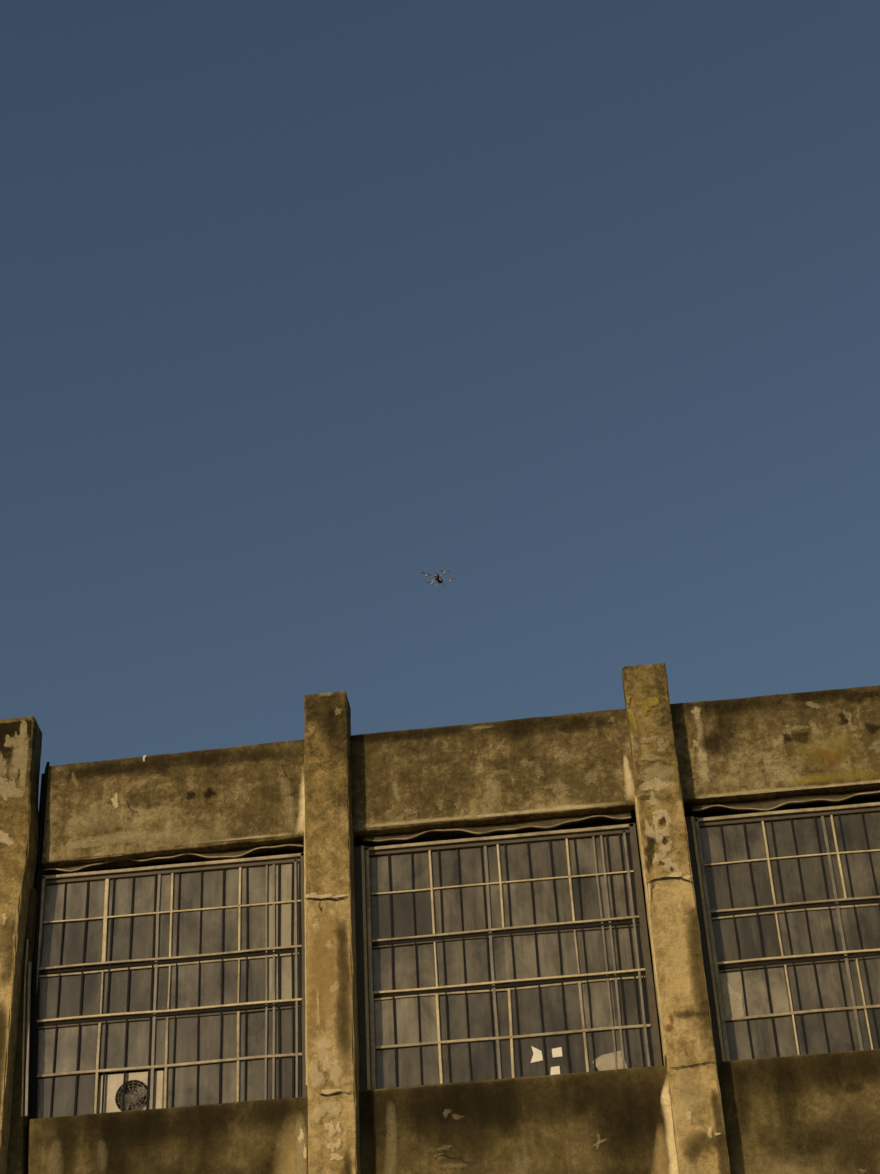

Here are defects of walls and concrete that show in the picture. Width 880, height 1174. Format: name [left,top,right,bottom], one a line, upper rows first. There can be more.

flaking render [0,721,29,801]
flaking render [644,816,676,871]
water stain [279,1127,307,1174]
water stain [654,1080,679,1174]
water stain [713,1097,729,1174]